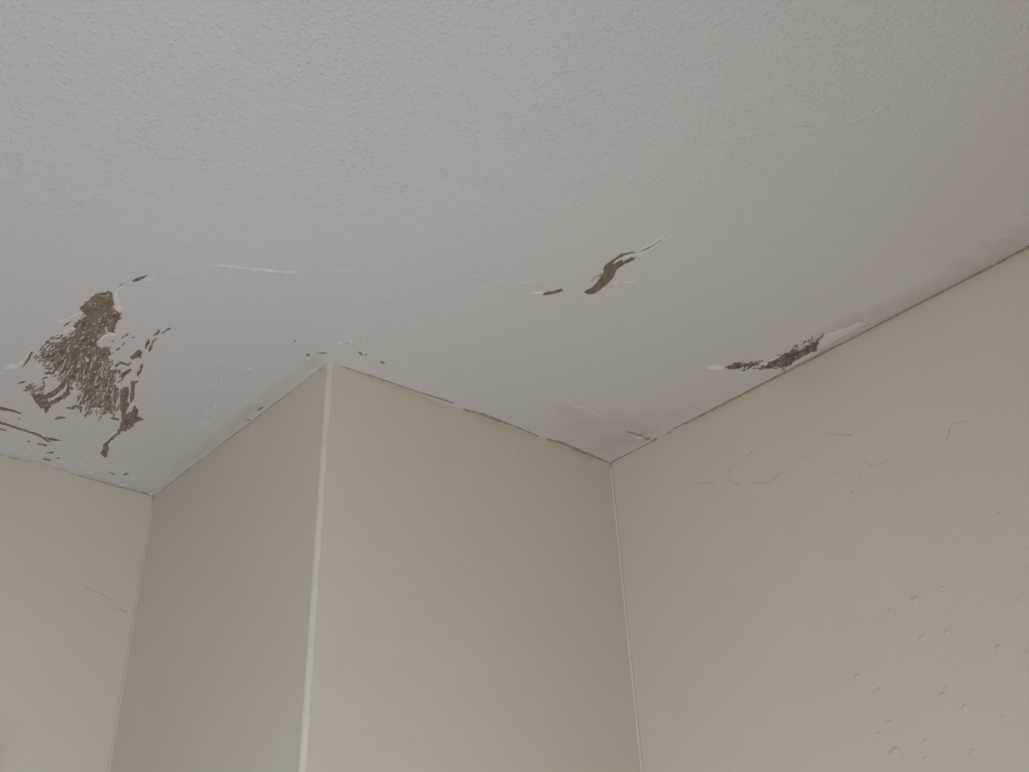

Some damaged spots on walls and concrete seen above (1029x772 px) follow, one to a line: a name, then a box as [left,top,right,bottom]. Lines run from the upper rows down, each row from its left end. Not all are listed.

crack [532,234,672,295]
peeling [0,275,171,461]
crack [73,246,1029,496]